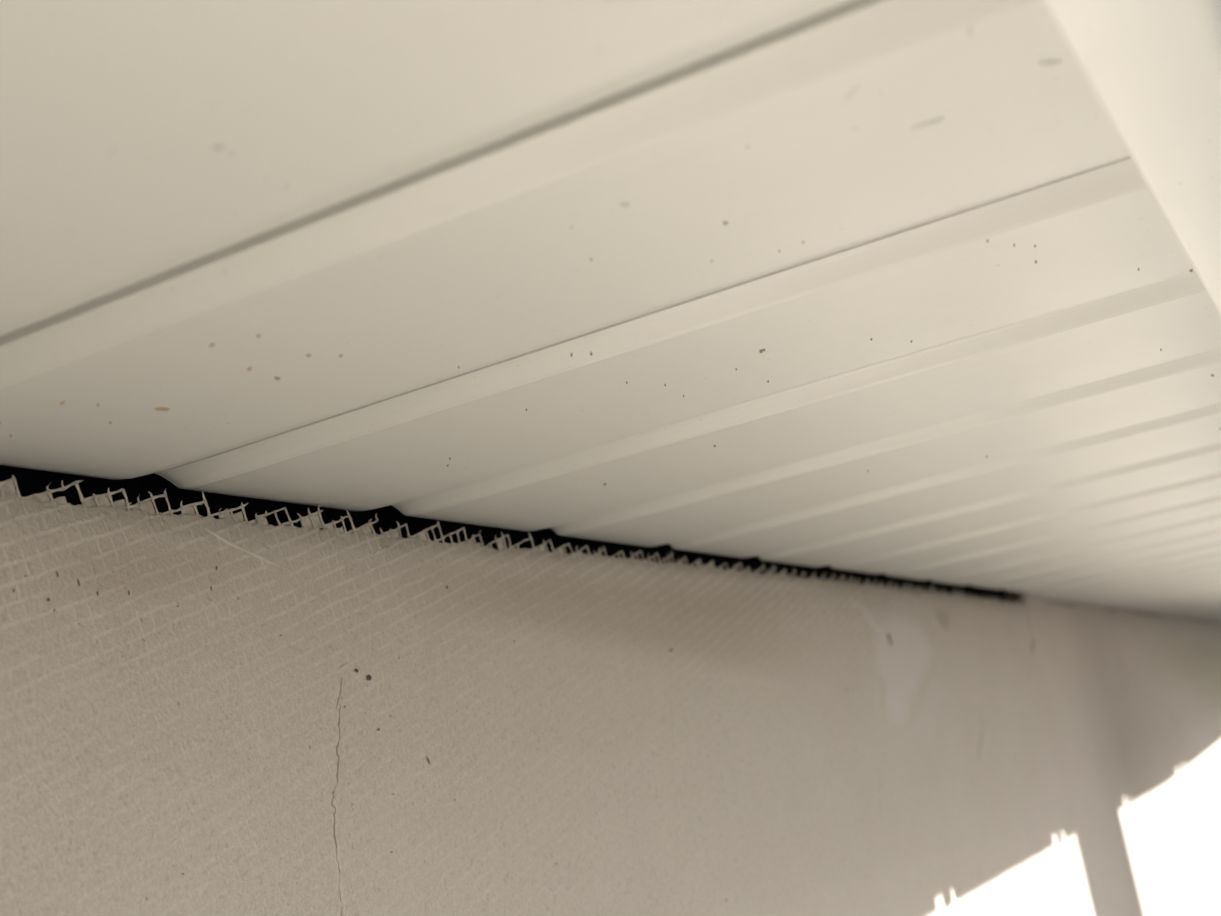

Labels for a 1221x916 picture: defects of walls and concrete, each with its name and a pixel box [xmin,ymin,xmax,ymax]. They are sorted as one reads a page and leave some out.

crack [330,662,349,916]